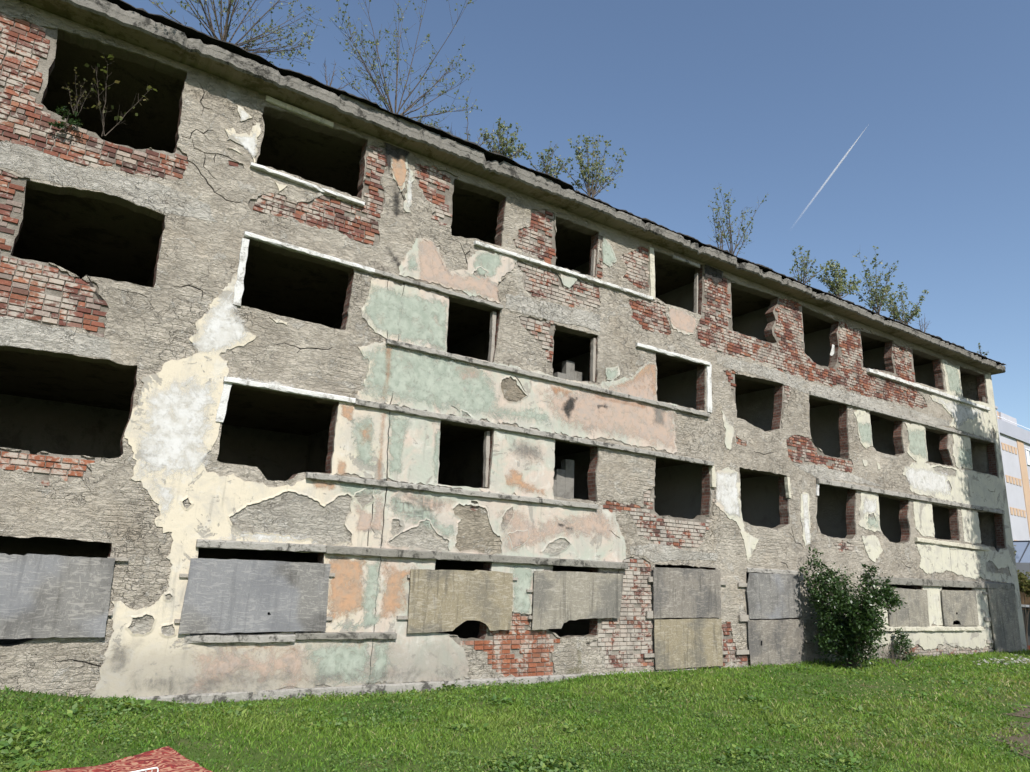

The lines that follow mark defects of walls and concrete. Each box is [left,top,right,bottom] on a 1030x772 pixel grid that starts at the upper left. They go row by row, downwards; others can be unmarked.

spalling [0,12,188,180]
crack [182,91,239,203]
spalling [248,145,458,246]
spalling [0,169,108,337]
spalling [0,448,107,488]
peeling [227,486,376,546]
spalling [386,210,1027,677]